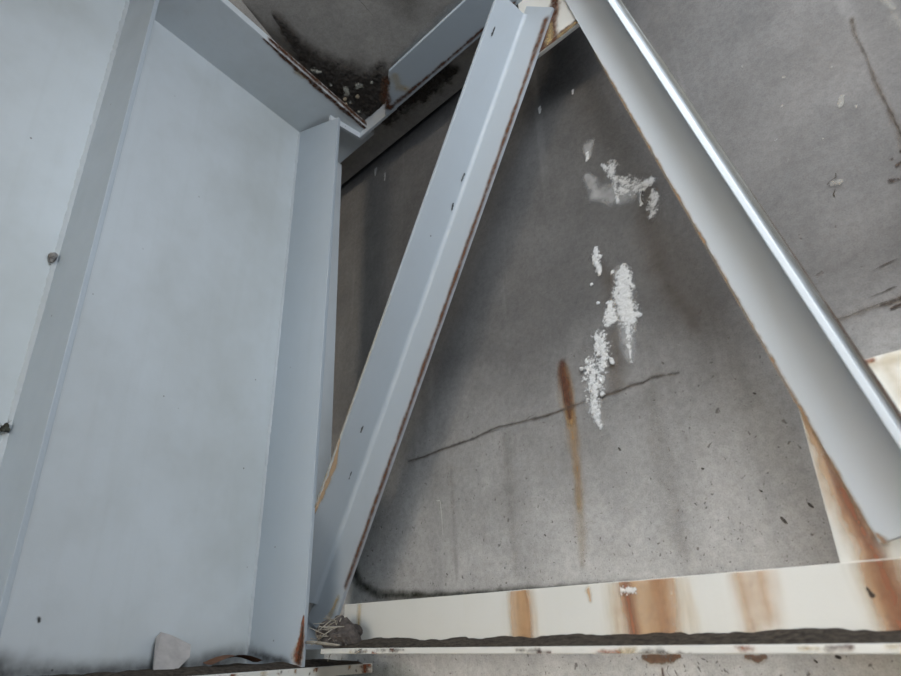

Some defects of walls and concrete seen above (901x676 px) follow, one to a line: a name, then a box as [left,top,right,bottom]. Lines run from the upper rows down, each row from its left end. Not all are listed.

rust [263,38,367,129]
efflorescence [584,141,593,162]
efflorescence [584,160,659,218]
rust [344,0,580,587]
efflorescence [577,246,643,430]
rust [750,190,901,418]
rust [786,385,901,631]
rust [511,590,530,638]
rust [620,578,675,635]